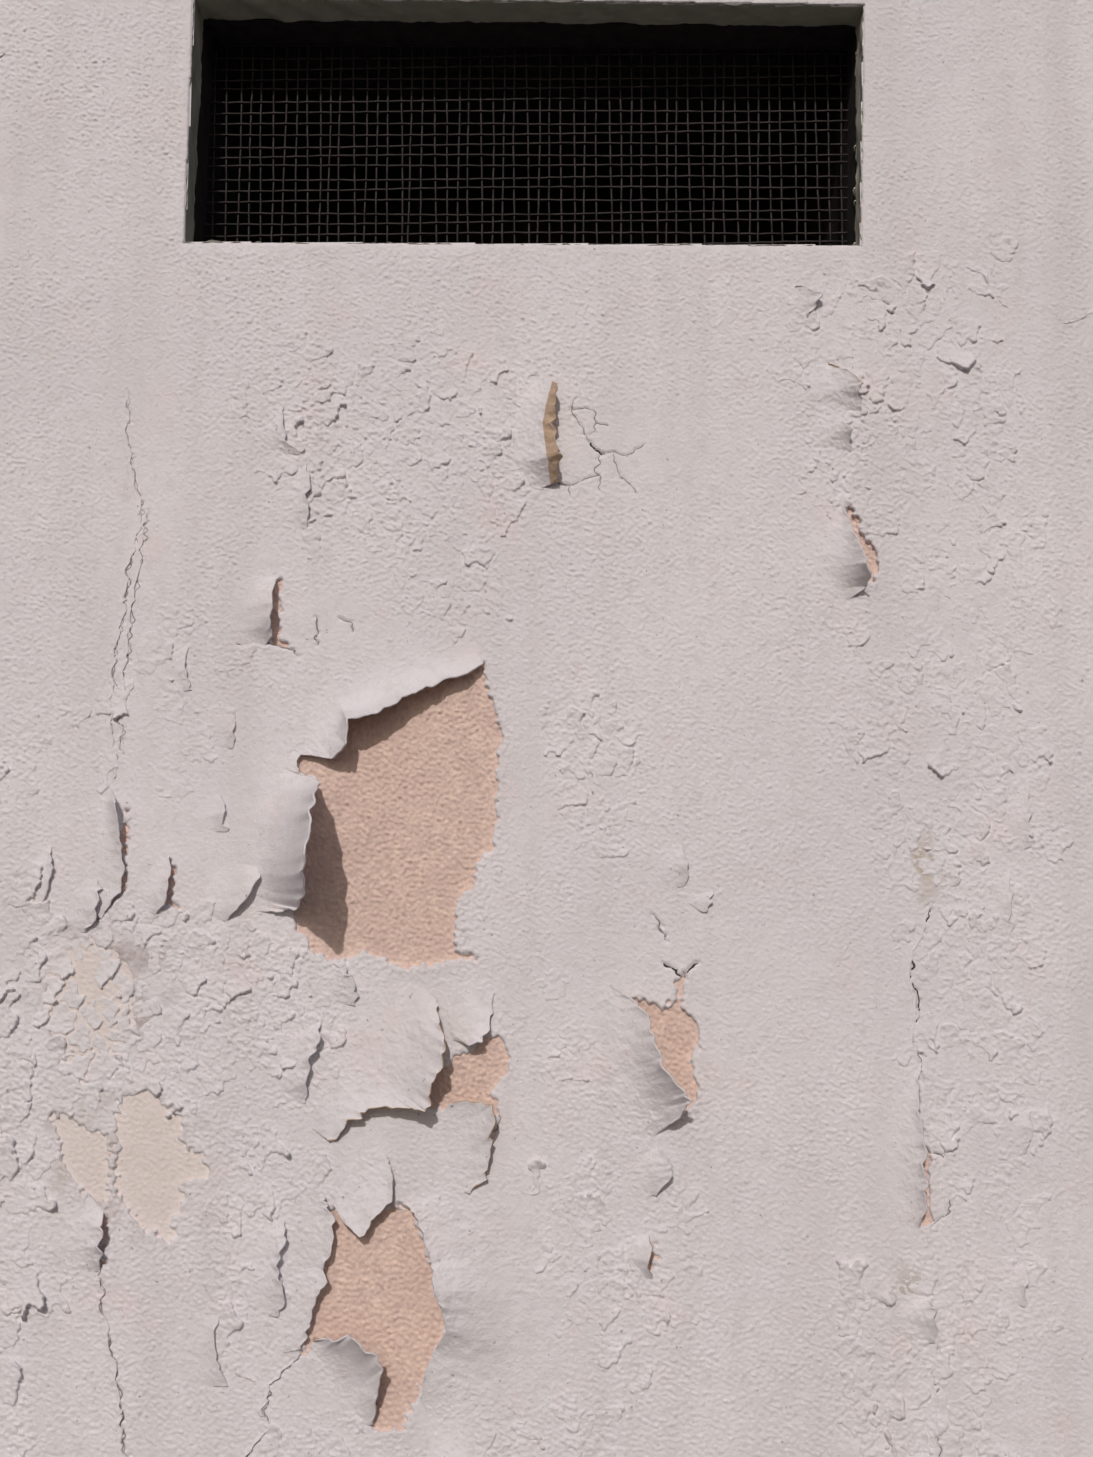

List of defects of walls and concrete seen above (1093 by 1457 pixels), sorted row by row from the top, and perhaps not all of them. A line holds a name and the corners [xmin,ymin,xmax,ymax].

crack [558,398,643,493]
crack [105,390,150,779]
peeling [766,220,1074,1086]
peeling [0,318,714,1457]
crack [904,903,933,1068]
crack [94,1269,127,1457]
peeling [825,1231,1014,1457]